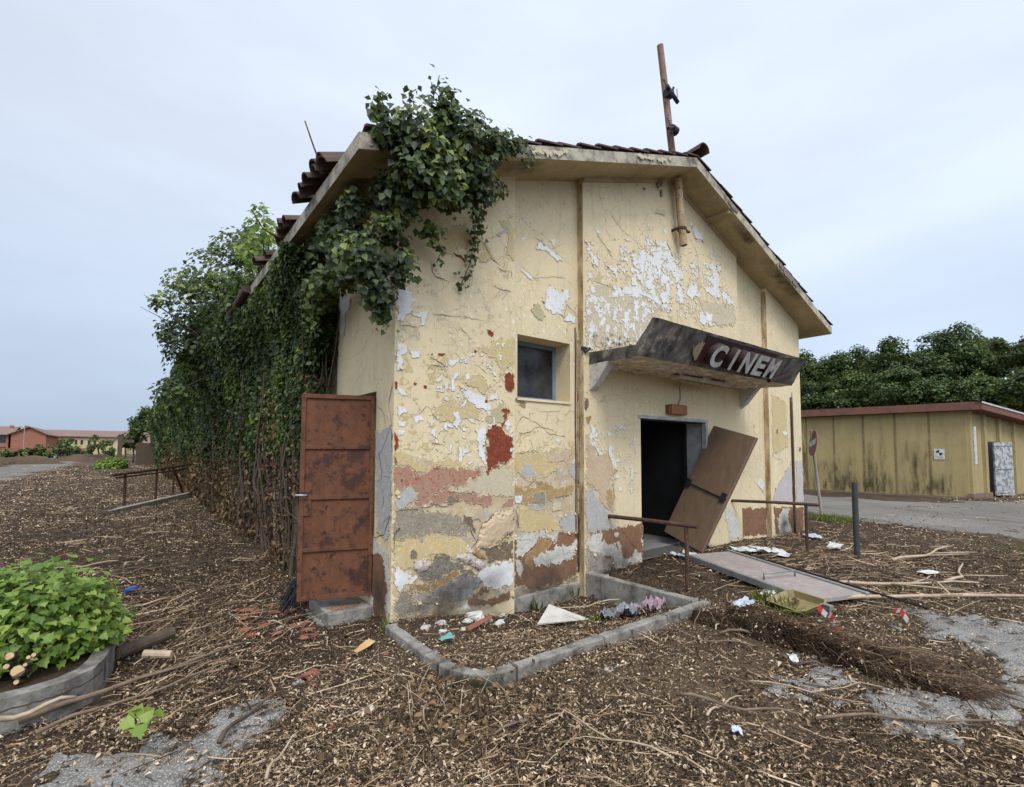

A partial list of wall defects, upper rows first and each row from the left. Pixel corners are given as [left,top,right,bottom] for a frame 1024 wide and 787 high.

crack [465,196,628,317]
peeling [531,209,737,379]
flaking render [367,218,644,622]
peeling [724,394,804,542]